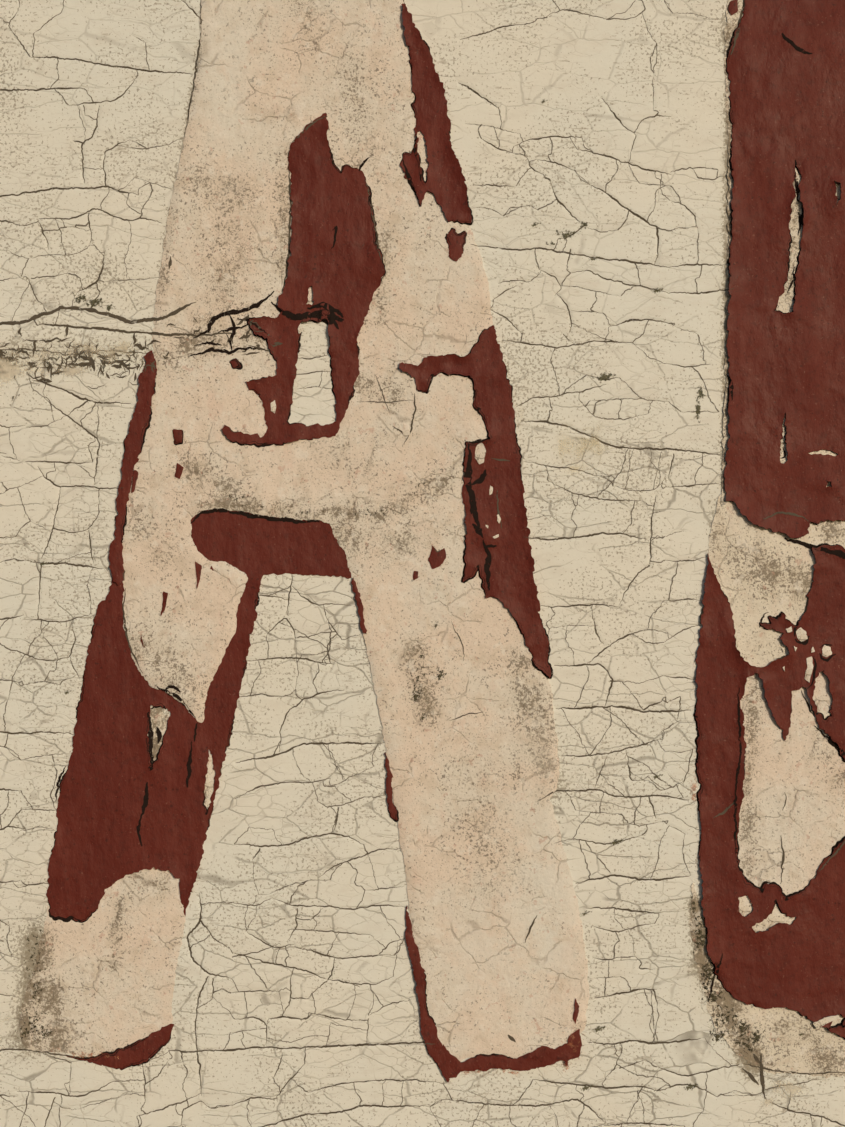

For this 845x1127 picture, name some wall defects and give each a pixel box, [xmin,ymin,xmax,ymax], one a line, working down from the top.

spalling [72,292,112,311]
crack [403,134,422,201]
crack [793,175,801,236]
crack [0,0,344,831]
peeling [122,0,590,1061]
crack [362,376,417,443]
crack [458,0,734,884]
peeling [707,0,845,933]
crack [764,512,845,559]
crack [0,576,845,1127]
peeling [19,867,186,1056]
peeling [688,883,845,1078]